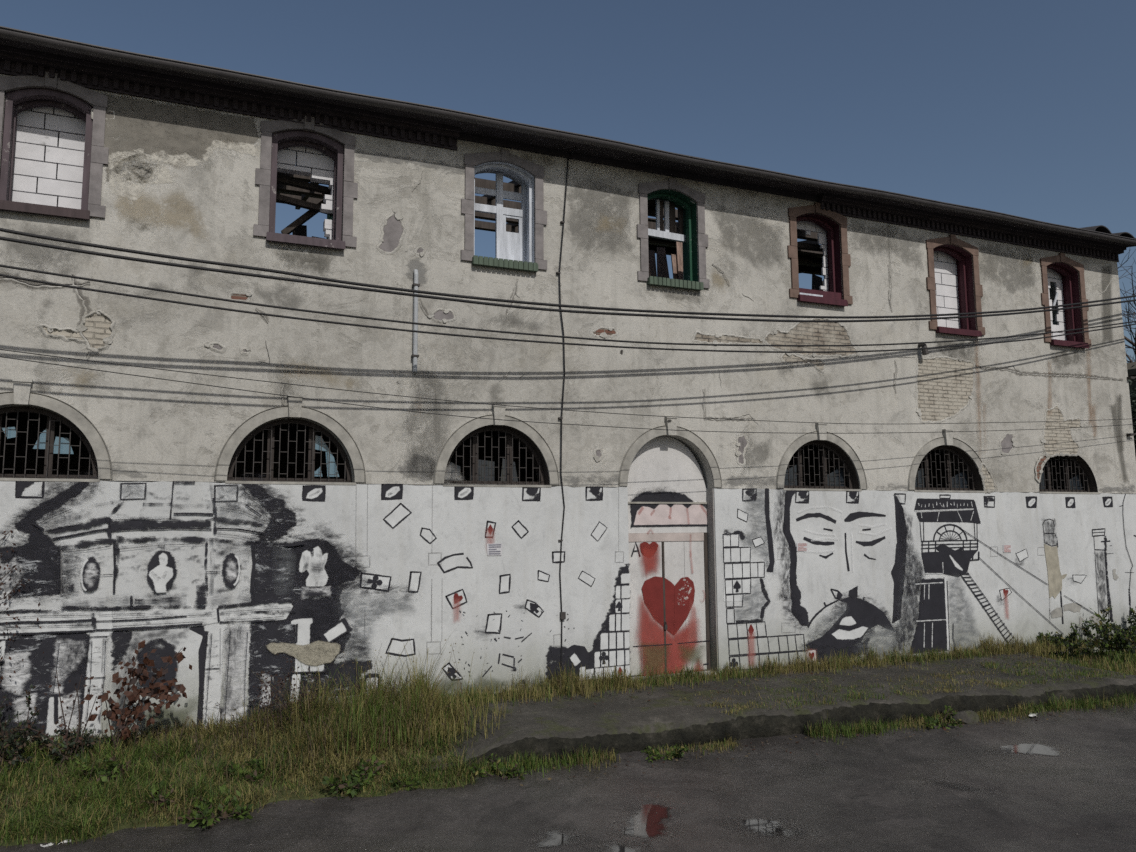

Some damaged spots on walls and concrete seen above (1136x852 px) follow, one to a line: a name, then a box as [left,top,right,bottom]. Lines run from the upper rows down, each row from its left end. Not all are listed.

peeling [91,95,259,200]
spalling [376,209,426,257]
crack [0,274,91,360]
spalling [692,318,860,373]
spalling [916,356,975,423]